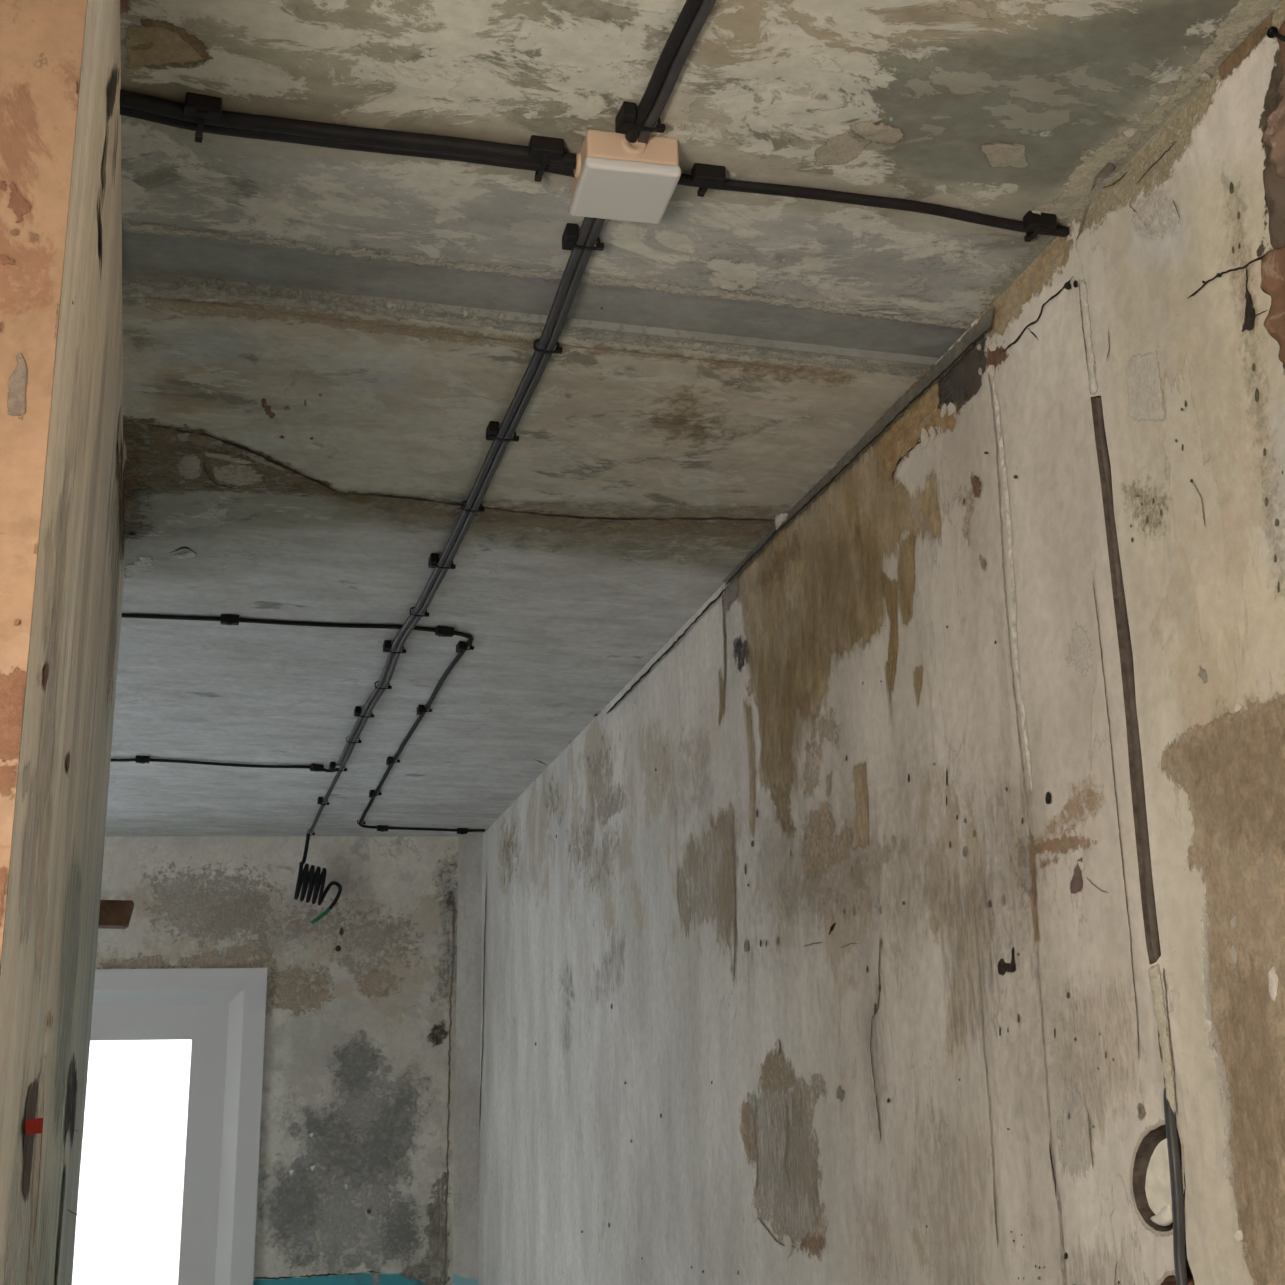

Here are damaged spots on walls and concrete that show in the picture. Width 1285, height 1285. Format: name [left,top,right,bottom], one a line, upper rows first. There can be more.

peeling [0,181,31,236]
peeling [7,353,27,420]
peeling [107,406,372,712]
peeling [122,0,1285,377]
crack [341,277,1078,716]
flaking render [867,363,960,484]
crack [1187,254,1268,332]
peeling [0,664,49,800]
peeling [1161,695,1285,1285]
flaking render [22,1057,47,1285]
leakage [260,1031,430,1285]
peeling [740,1039,826,1258]